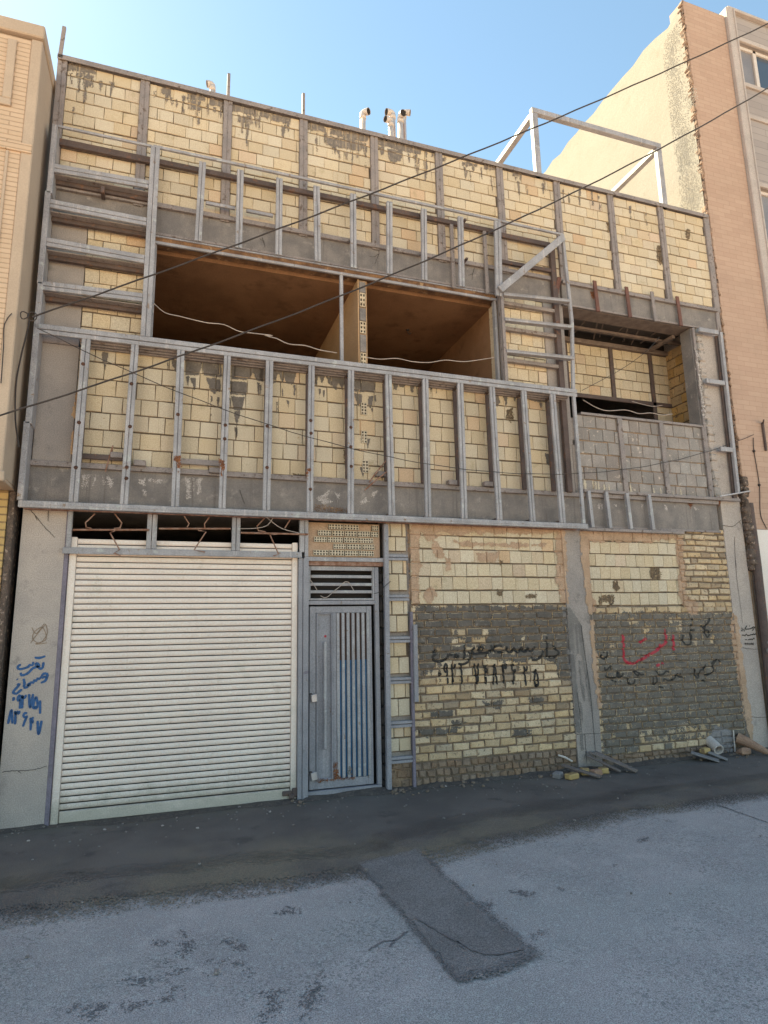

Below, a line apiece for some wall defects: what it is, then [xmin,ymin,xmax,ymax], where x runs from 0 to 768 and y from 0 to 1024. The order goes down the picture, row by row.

leakage [68,62,115,115]
leakage [153,87,291,146]
leakage [308,123,446,181]
leakage [462,161,495,191]
leakage [167,359,296,438]
spalling [597,580,620,608]
spalling [649,567,662,580]